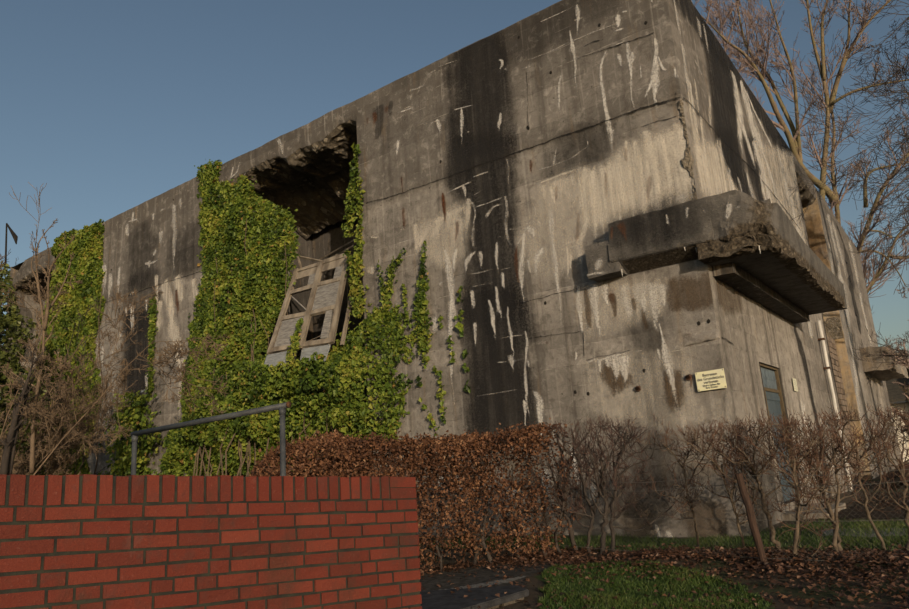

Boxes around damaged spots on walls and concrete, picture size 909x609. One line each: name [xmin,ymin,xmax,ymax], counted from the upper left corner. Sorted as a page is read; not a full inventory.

damp [414,0,805,445]